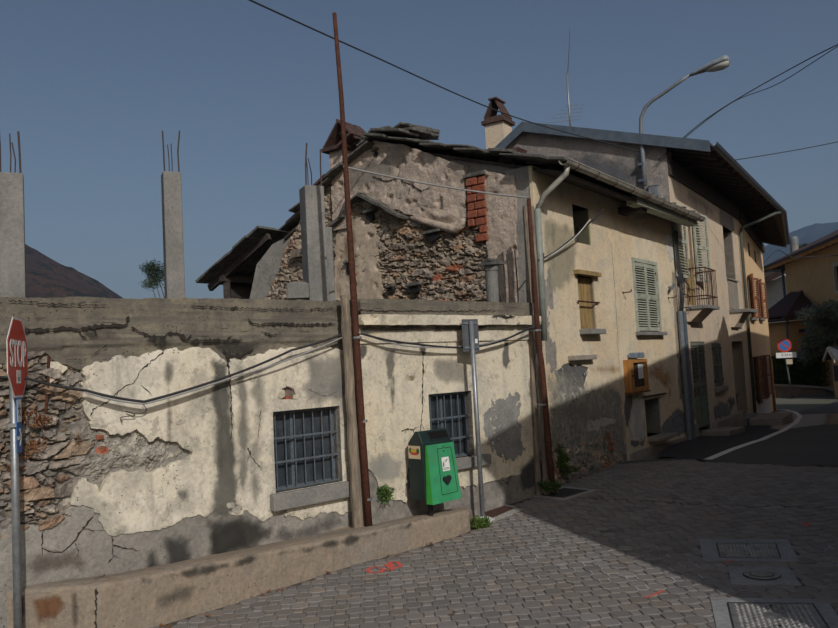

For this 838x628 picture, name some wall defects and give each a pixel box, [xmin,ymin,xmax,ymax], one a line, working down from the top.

crack [372,171,430,192]
spalling [266,221,304,301]
spalling [305,143,489,302]
crack [10,300,515,467]
spalling [0,351,190,538]
leakage [211,362,270,564]
flaking render [359,459,536,526]
flaking render [483,392,526,463]
flaking render [548,363,645,485]
crack [41,517,138,562]
leakage [167,540,226,576]
leakage [323,535,358,546]